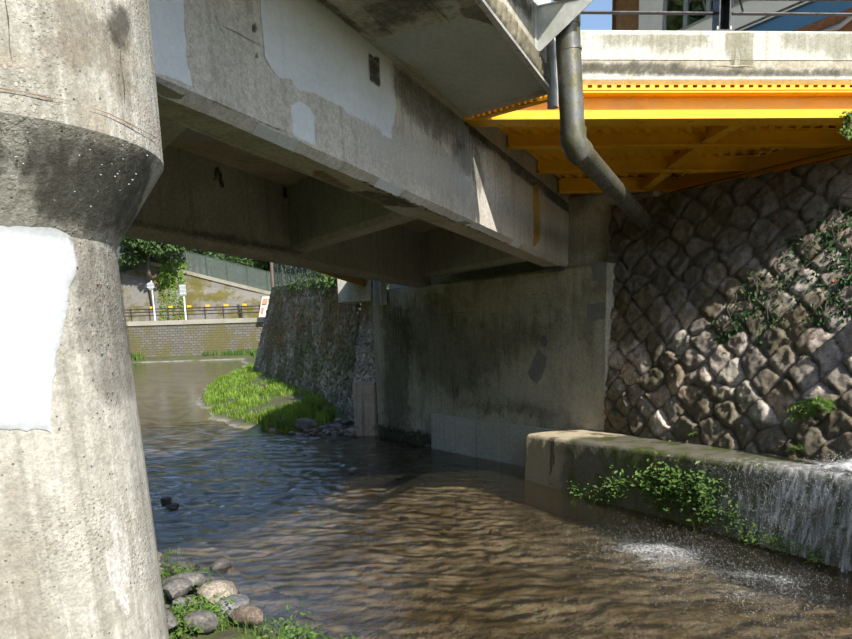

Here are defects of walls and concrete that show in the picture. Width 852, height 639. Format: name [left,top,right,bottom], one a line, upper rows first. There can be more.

damp [109,7,129,45]
damp [14,132,152,233]
damp [379,310,432,448]